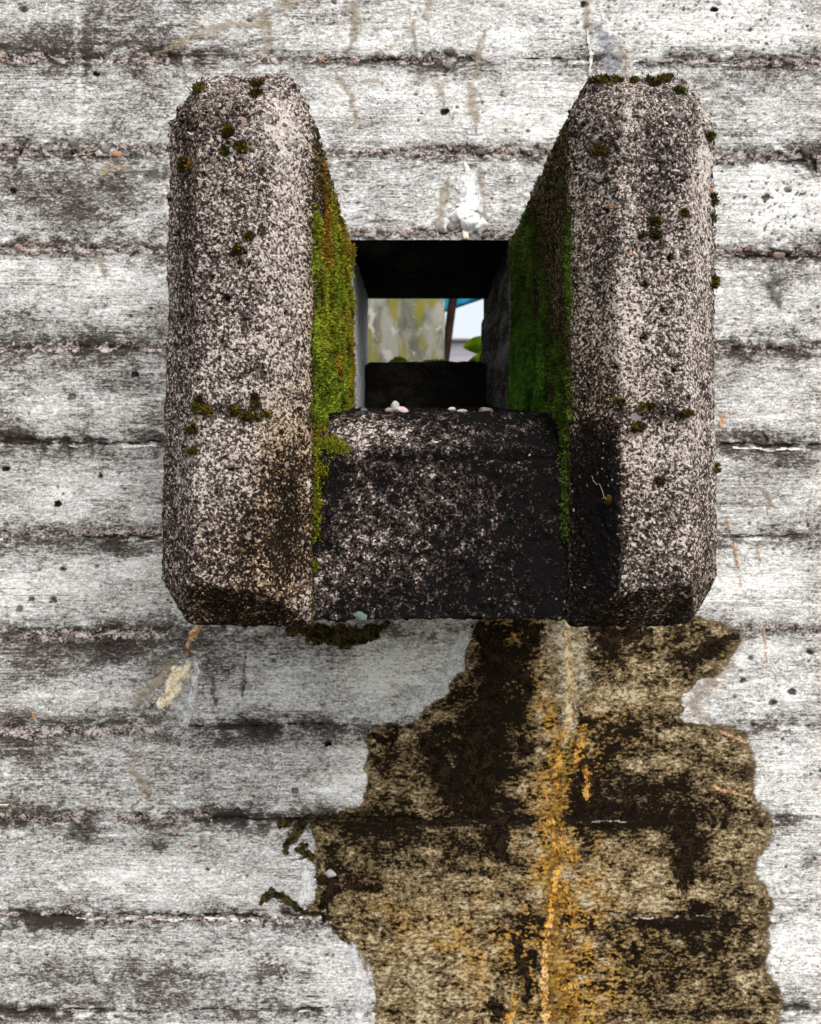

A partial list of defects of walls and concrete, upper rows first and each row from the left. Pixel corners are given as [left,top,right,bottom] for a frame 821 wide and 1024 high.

water stain [434,162,487,239]
water stain [134,625,218,727]
rust [535,721,594,801]
water stain [259,615,785,1024]
rust [538,818,587,1024]
rust [502,988,520,1024]